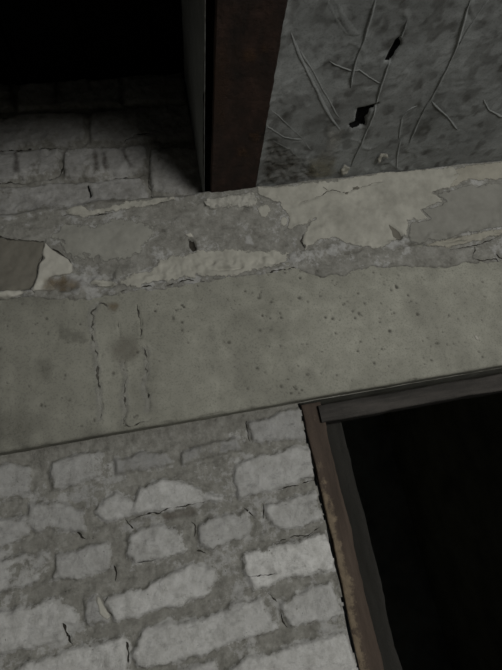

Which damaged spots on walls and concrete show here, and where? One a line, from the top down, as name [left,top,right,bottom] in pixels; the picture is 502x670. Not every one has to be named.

spalling [385,37,400,60]
hole [349,102,379,128]
peeling [64,196,175,218]
peeling [257,162,502,250]
flaking render [0,236,73,300]
peeling [91,232,300,292]
crack [90,302,107,419]
crack [137,304,149,374]
crack [125,502,204,529]
crack [63,623,73,645]